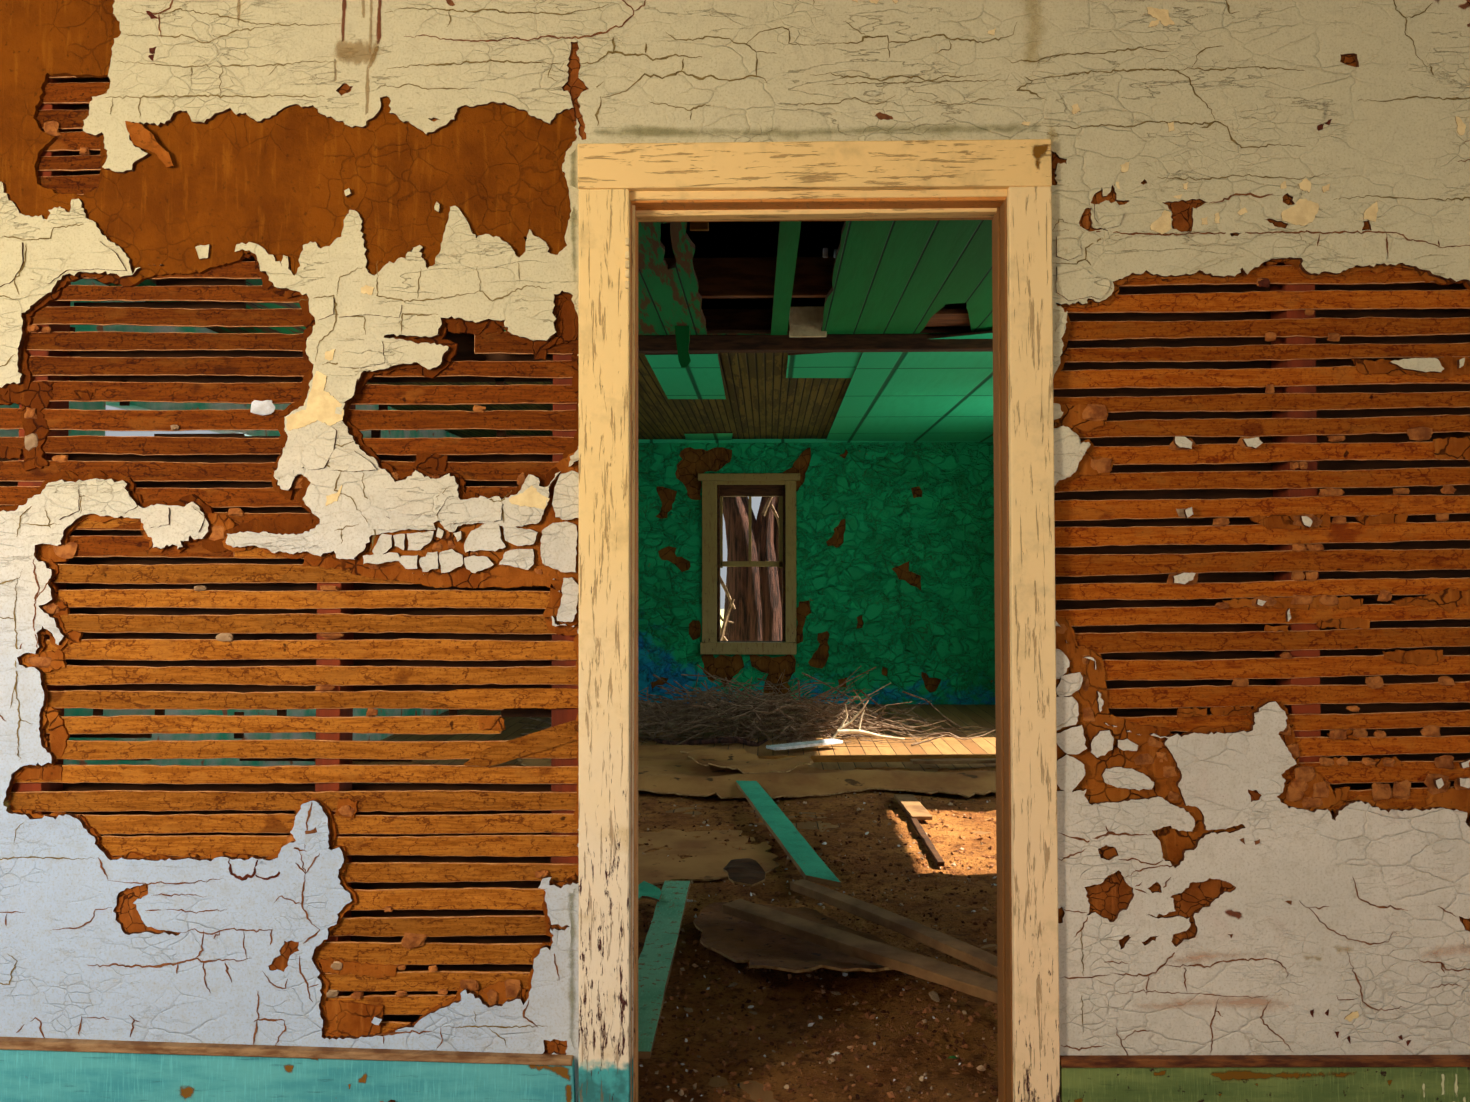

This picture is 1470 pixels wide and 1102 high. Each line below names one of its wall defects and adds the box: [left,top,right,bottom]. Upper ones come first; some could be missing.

crack [105,0,342,116]
crack [381,0,1470,265]
spalling [1150,183,1238,236]
spalling [0,0,588,1037]
peeling [656,447,732,519]
spalling [1053,259,1470,866]
peeling [689,600,829,700]
crack [0,802,326,1045]
crack [1059,827,1178,893]
spalling [1085,845,1235,947]
crack [1062,909,1291,1055]
crack [1300,876,1470,1011]